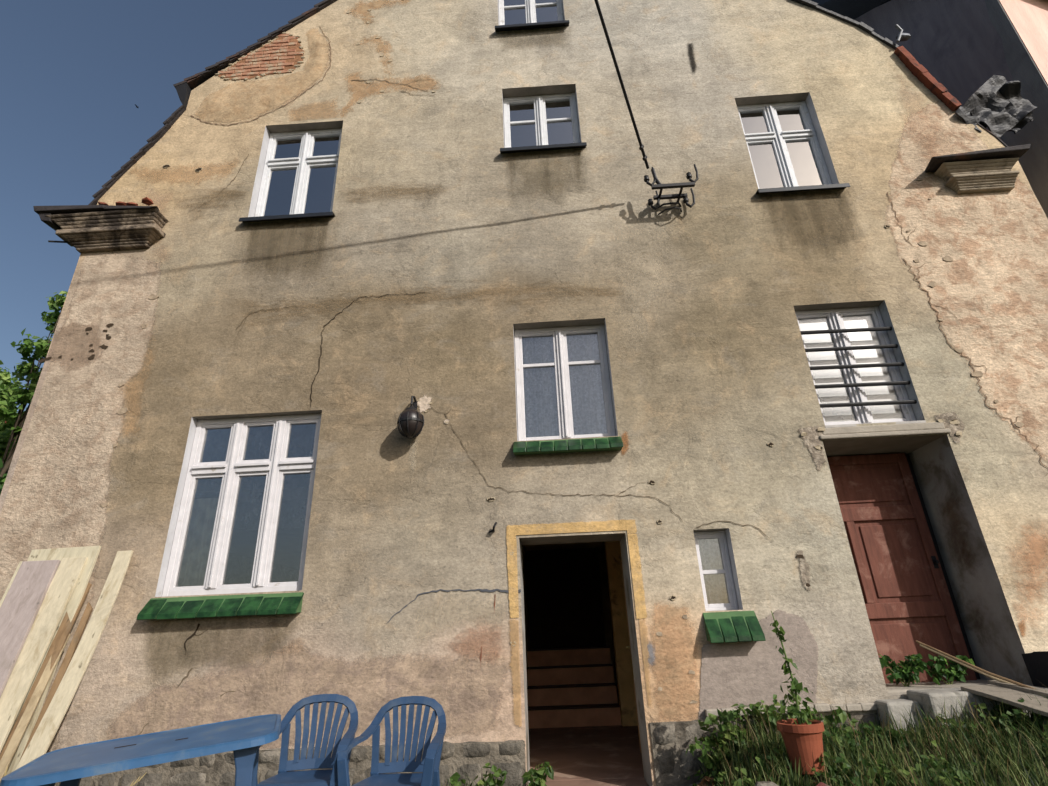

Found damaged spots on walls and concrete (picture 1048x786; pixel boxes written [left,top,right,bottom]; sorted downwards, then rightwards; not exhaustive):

flaking render [215,32,305,81]
peeling [342,75,437,116]
peeling [0,251,161,601]
crack [310,292,428,407]
flaking render [417,395,432,412]
crack [430,406,770,539]
peeling [884,102,1048,459]
crack [887,192,1048,468]
peeling [38,559,99,717]
crack [177,624,205,688]
crack [386,589,521,624]
peeling [46,712,67,753]